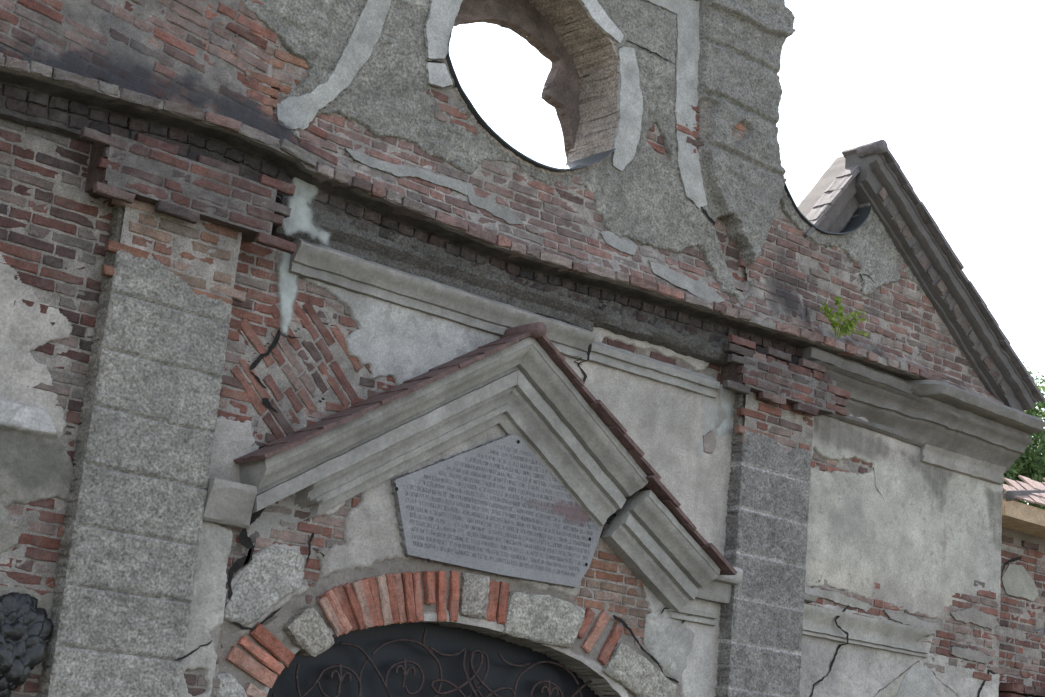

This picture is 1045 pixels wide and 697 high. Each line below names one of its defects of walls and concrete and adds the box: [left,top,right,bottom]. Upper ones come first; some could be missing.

damp [283,177,329,243]
spalling [0,0,1005,405]
spalling [0,117,397,463]
damp [280,252,297,333]
crack [250,329,300,413]
crack [574,344,591,383]
spalling [734,392,872,474]
spalling [0,498,68,595]
crack [224,508,282,631]
crack [175,640,213,661]
crack [810,605,849,697]
spalling [806,563,1039,681]